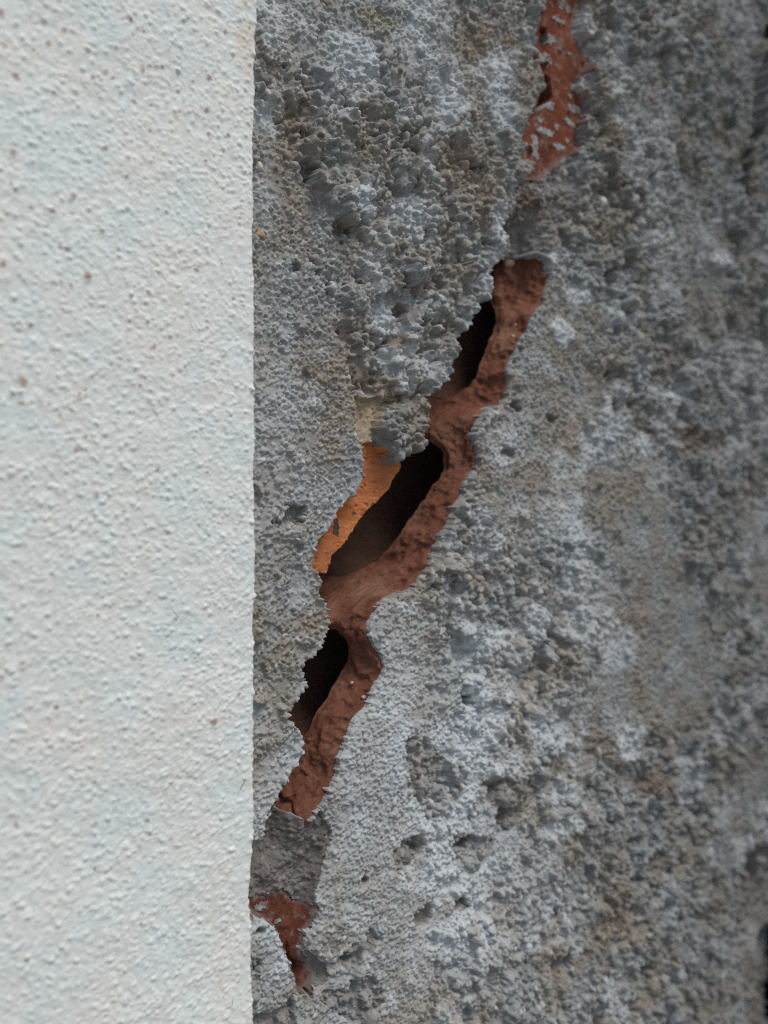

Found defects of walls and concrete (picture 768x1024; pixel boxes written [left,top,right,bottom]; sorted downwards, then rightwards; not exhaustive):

spalling [275,503,308,527]
spalling [306,242,454,574]
crack [248,0,599,999]
peeling [405,736,471,806]